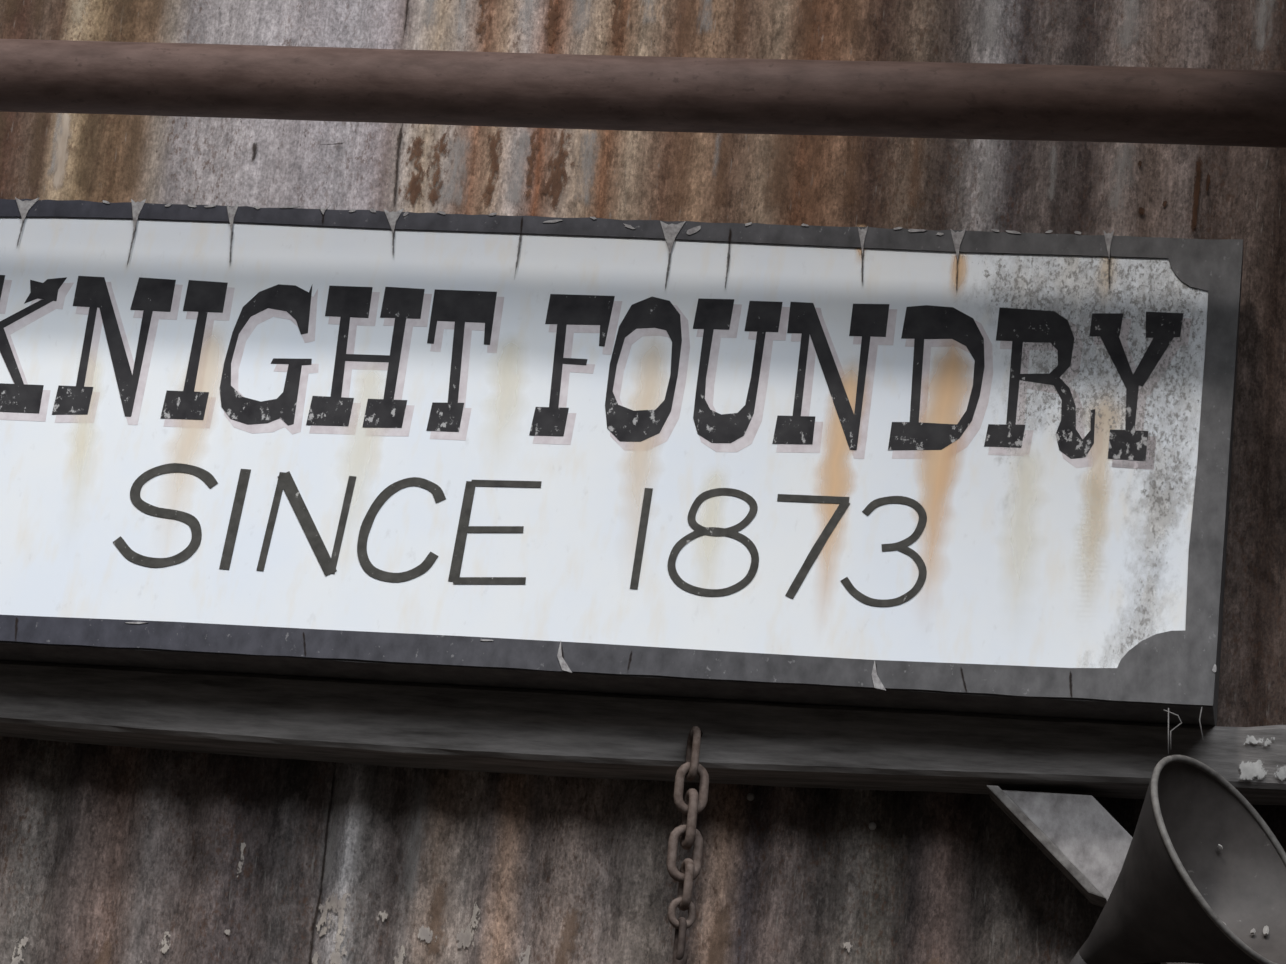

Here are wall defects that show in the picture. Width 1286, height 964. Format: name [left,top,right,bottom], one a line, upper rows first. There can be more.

rust [475,0,492,41]
rust [543,0,561,54]
rust [611,0,626,50]
rust [399,132,449,208]
rust [479,131,503,210]
rust [522,130,575,210]
peeling [11,937,32,964]
peeling [312,892,351,964]
peeling [394,945,410,964]
peeling [418,925,437,943]
peeling [456,901,481,950]